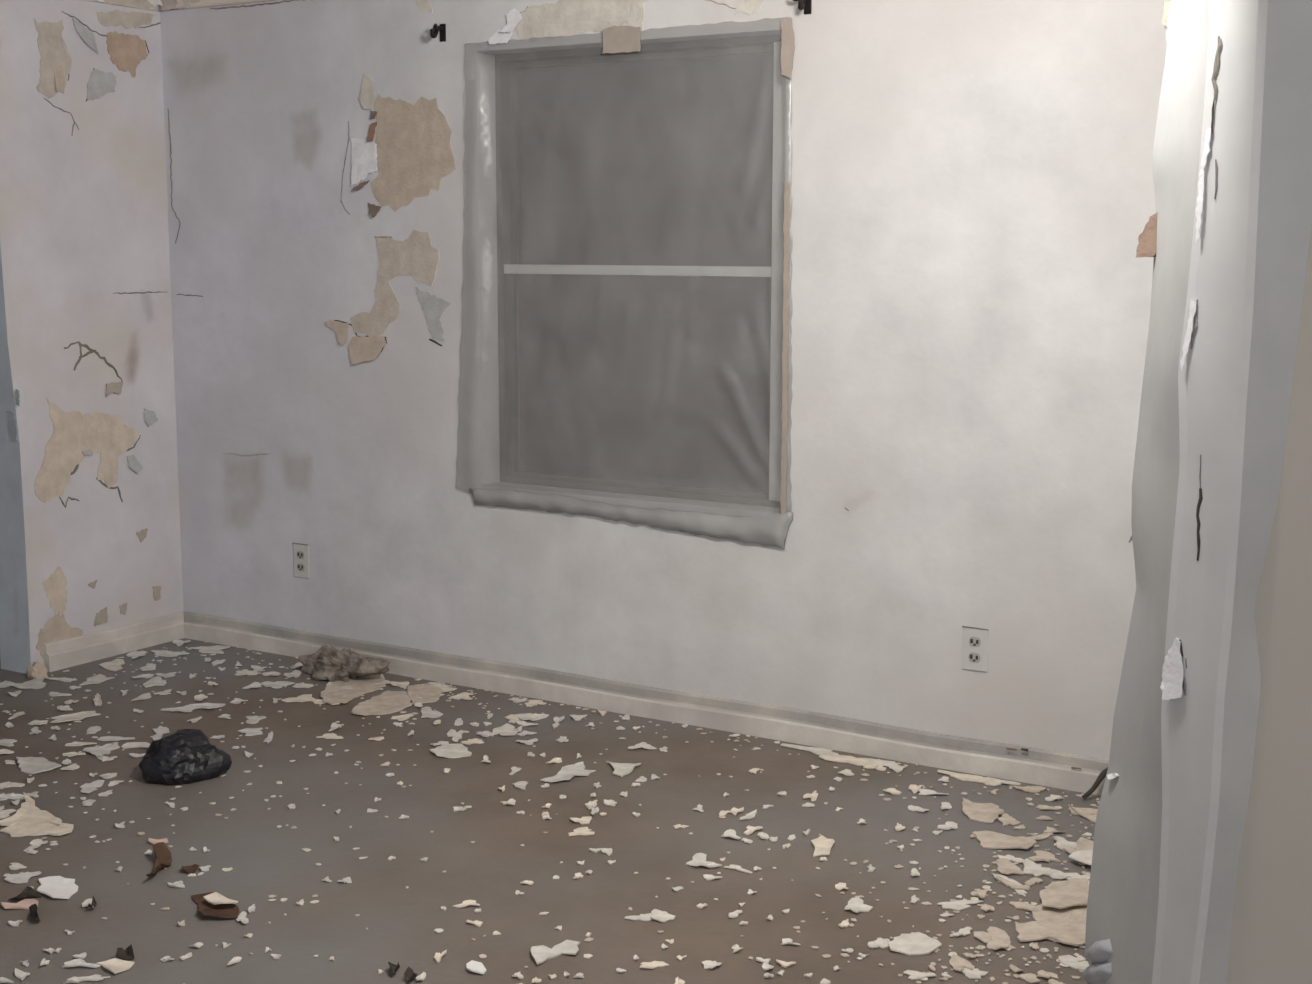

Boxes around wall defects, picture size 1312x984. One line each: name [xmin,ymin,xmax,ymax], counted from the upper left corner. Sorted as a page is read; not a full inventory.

peeling [34,0,201,102]
peeling [488,0,648,44]
peeling [351,73,456,217]
peeling [1136,212,1158,257]
peeling [324,230,451,364]
crack [64,341,123,397]
peeling [34,398,158,508]
crack [1195,455,1203,561]
peeling [36,566,127,659]
peeling [1160,637,1187,700]